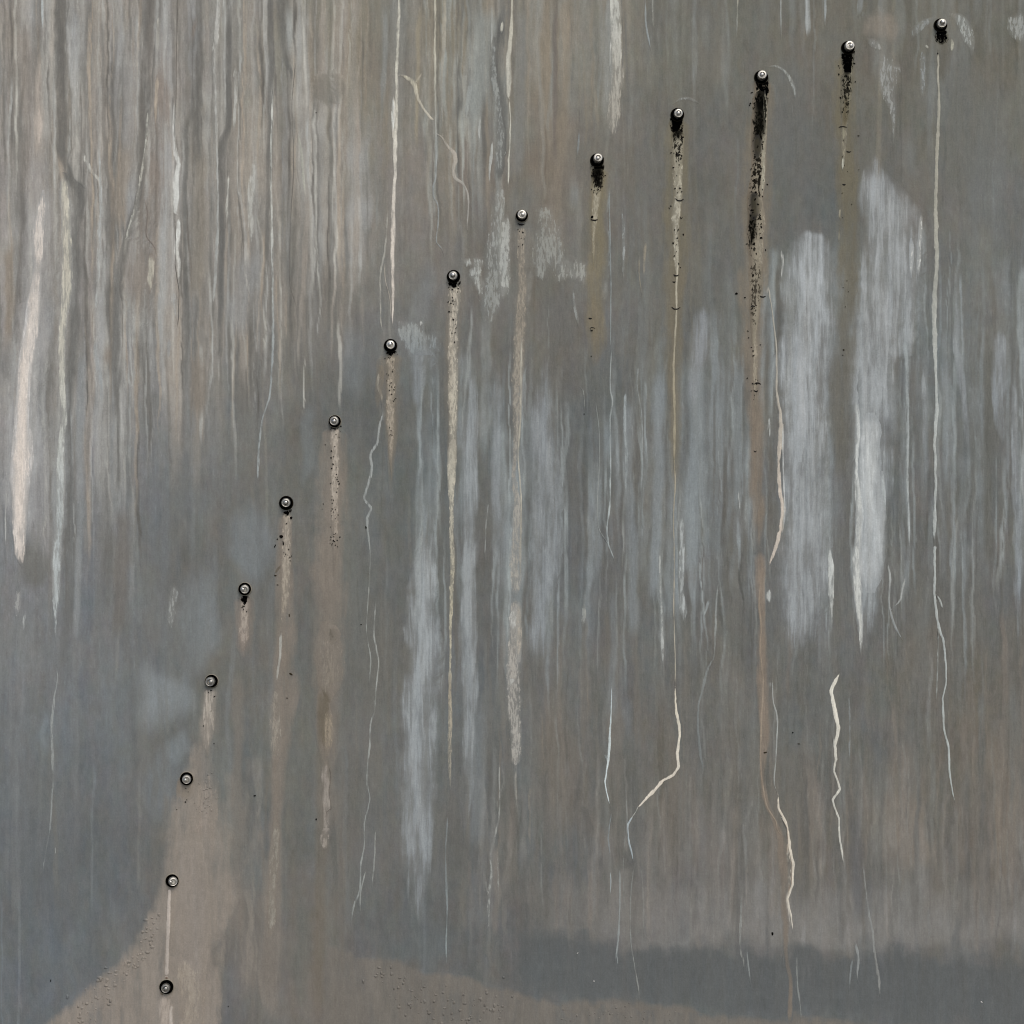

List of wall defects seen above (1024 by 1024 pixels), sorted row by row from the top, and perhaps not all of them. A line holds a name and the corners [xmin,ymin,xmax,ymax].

rust [582,162,610,379]
crack [604,683,681,895]
water stain [319,196,1024,1024]
rust [734,75,793,1024]
crack [771,678,795,936]
crack [829,673,845,870]
rust [823,49,864,517]
water stain [849,30,956,805]